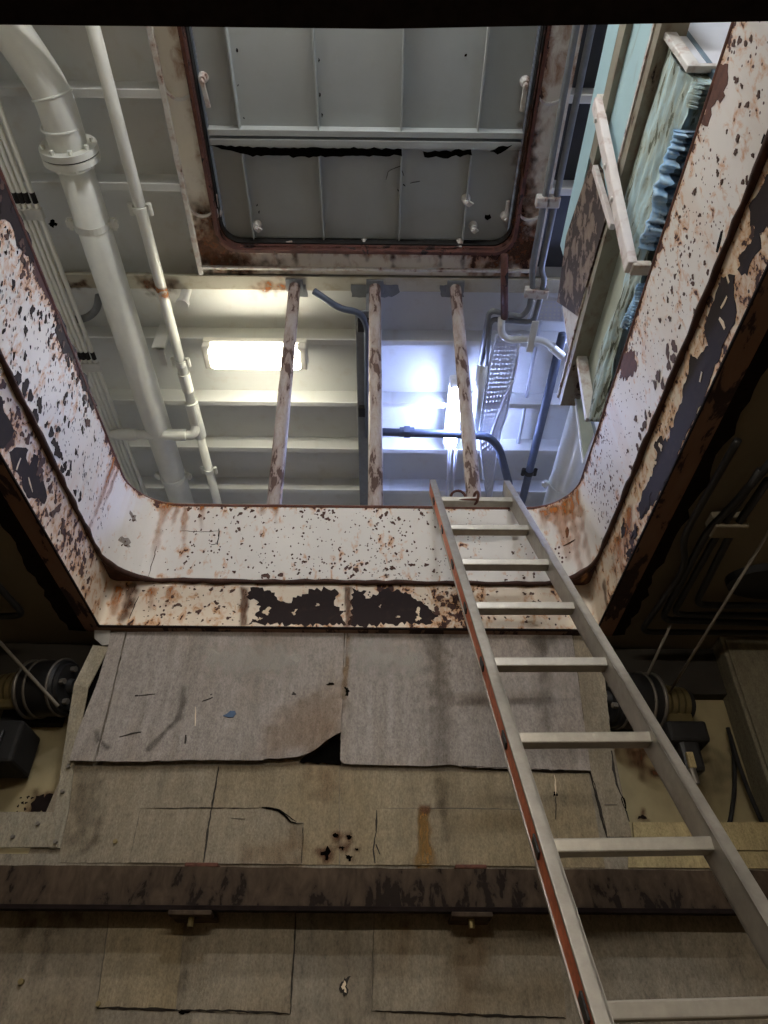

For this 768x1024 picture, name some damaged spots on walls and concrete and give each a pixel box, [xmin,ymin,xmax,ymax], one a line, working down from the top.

spalling [731,34,753,47]
corrosion [193,207,286,292]
peeling [586,129,768,558]
peeling [142,506,464,627]
hole [320,833,359,861]
corrosion [416,806,433,868]